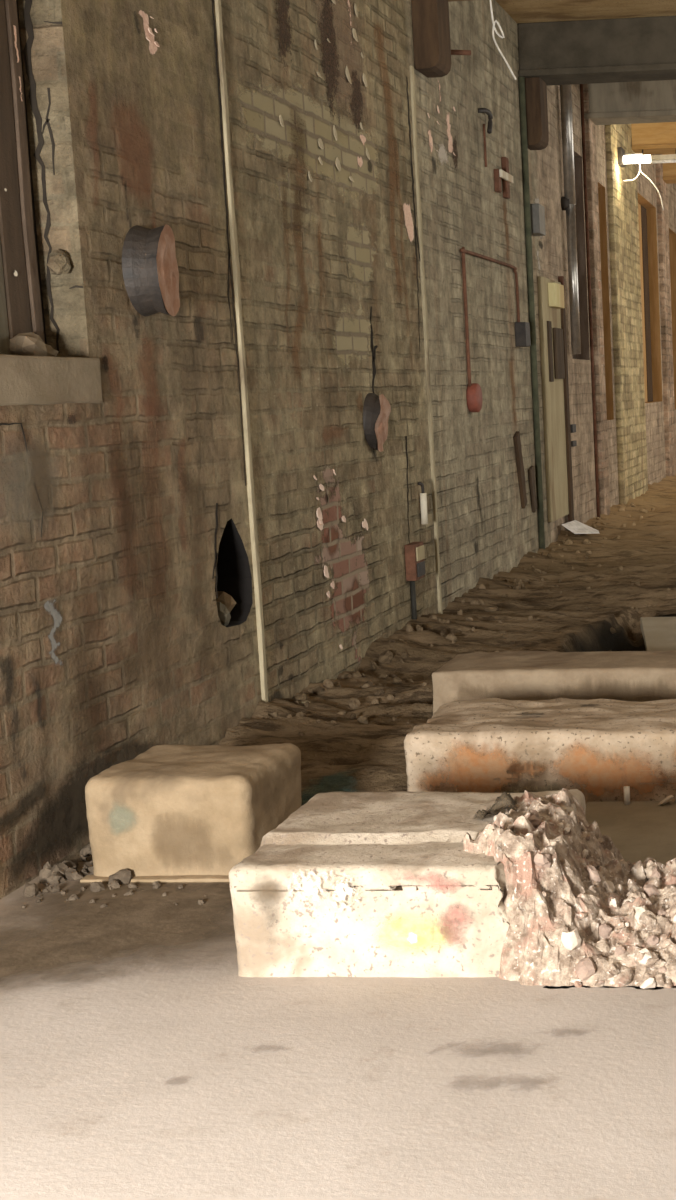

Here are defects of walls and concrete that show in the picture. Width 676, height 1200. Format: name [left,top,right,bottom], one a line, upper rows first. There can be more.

peeling [134,10,160,55]
crack [24,0,83,353]
peeling [313,465,369,663]
leakage [0,742,147,878]